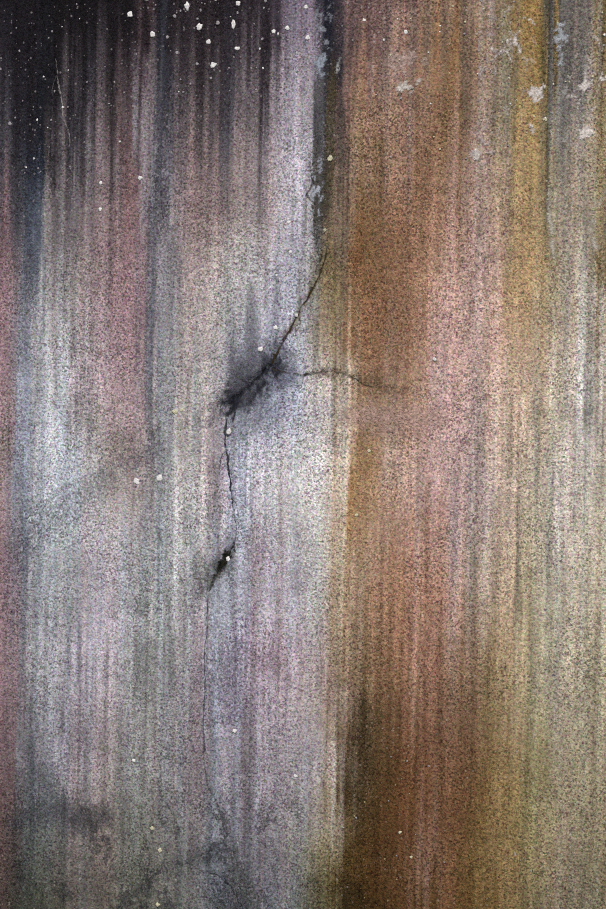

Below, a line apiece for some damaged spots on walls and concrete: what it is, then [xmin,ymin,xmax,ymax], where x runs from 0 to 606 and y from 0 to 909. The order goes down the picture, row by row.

damp [0,0,269,702]
crack [203,161,391,838]
damp [282,0,347,377]
corrosion [348,431,372,557]
corrosion [344,32,466,399]
corrosion [328,495,512,909]